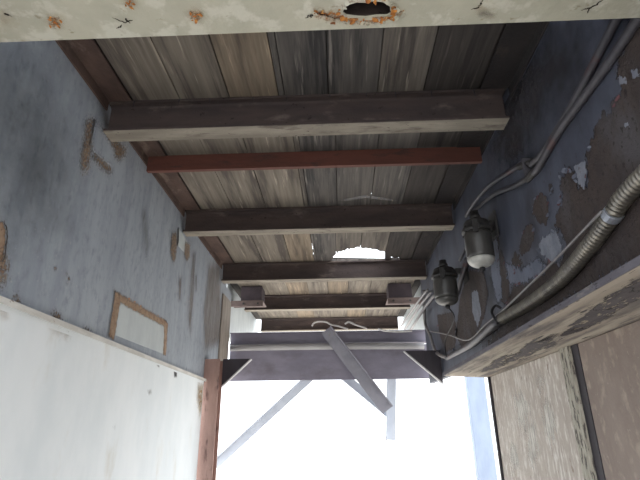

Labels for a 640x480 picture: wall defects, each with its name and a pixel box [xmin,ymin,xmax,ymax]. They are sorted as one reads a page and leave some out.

corrosion [330,1,404,27]
peeling [437,27,640,352]
peeling [481,278,640,372]